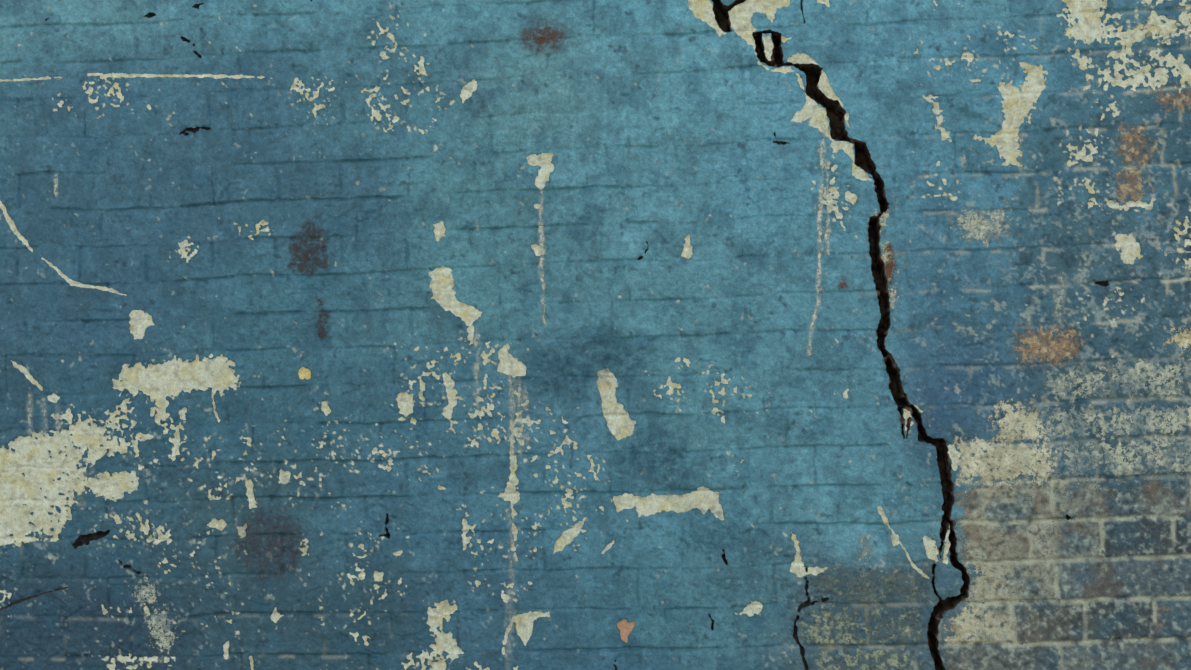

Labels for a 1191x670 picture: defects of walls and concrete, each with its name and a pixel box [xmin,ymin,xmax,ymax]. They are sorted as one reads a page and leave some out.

peeling [1056,0,1191,211]
peeling [1115,232,1143,264]
peeling [429,266,482,345]
crack [711,0,971,670]
peeling [112,354,241,462]
peeling [596,368,636,440]
peeling [0,419,139,549]
peeling [245,479,257,509]
peeling [613,486,725,520]
flaking render [790,320,1191,670]
peeling [106,559,178,670]
peeling [427,600,464,670]